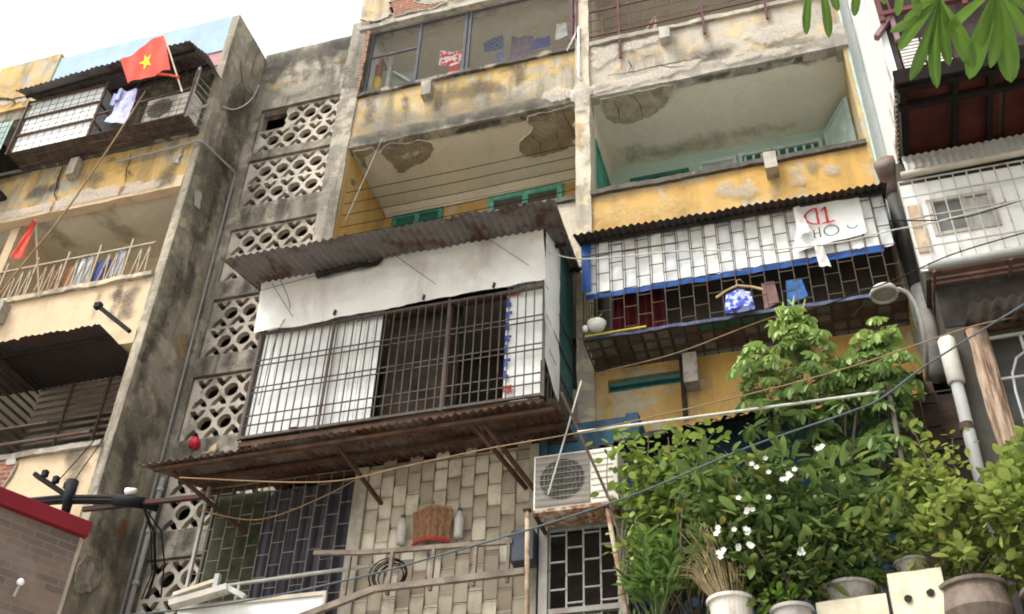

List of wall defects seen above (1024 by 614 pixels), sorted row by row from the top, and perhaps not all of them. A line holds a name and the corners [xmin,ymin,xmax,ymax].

flaking render [388,0,453,17]
leakage [352,64,552,142]
flaking render [518,56,705,163]
leakage [194,87,253,242]
flaking render [353,139,435,174]
leakage [113,285,136,316]